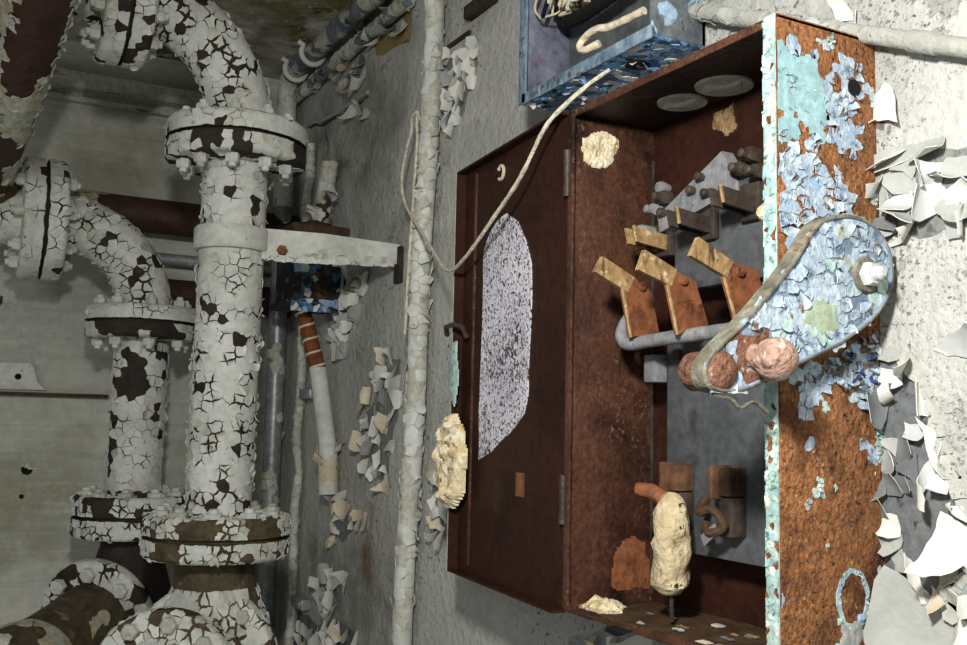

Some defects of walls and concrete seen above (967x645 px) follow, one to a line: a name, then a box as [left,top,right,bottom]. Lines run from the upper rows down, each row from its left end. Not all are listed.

peeling [868,82,897,130]
peeling [865,136,967,247]
peeling [260,0,479,645]
peeling [932,322,967,358]
peeling [863,347,967,645]
peeling [569,625,667,645]